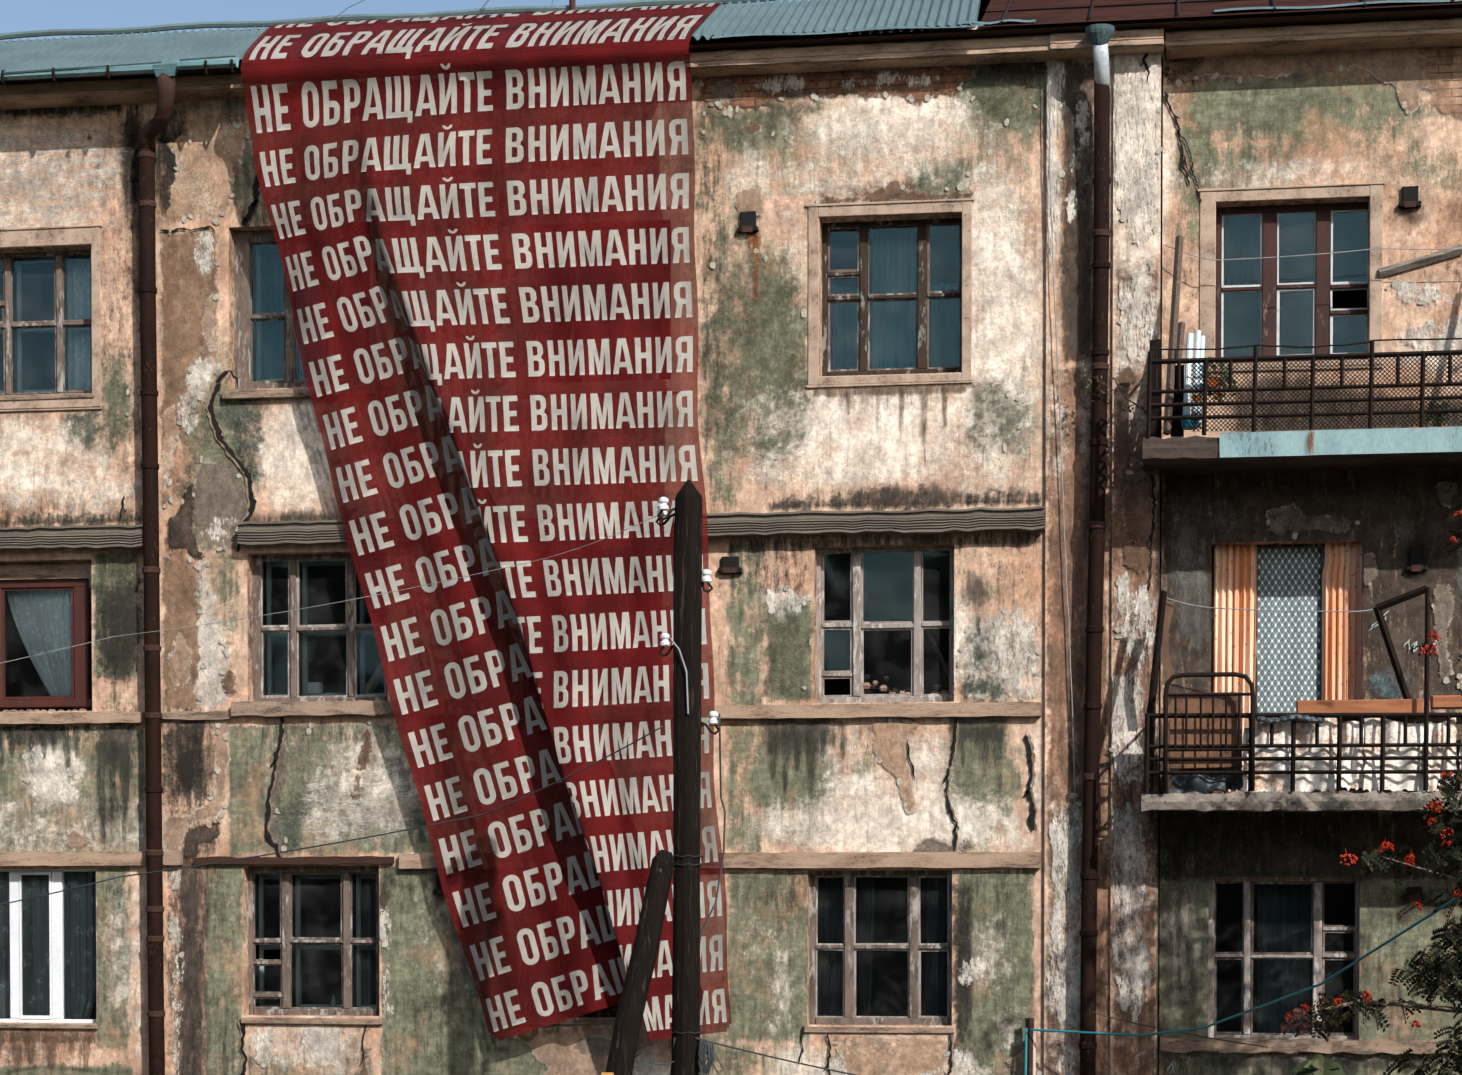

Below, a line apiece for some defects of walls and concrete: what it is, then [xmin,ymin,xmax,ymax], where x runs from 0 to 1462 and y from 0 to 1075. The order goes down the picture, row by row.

flaking render [695,62,1091,255]
crack [1139,53,1202,201]
crack [206,370,257,552]
damp [774,483,1039,511]
damp [92,577,144,684]
damp [161,719,208,805]
crack [265,717,285,858]
crack [906,719,959,852]
crack [1023,735,1038,831]